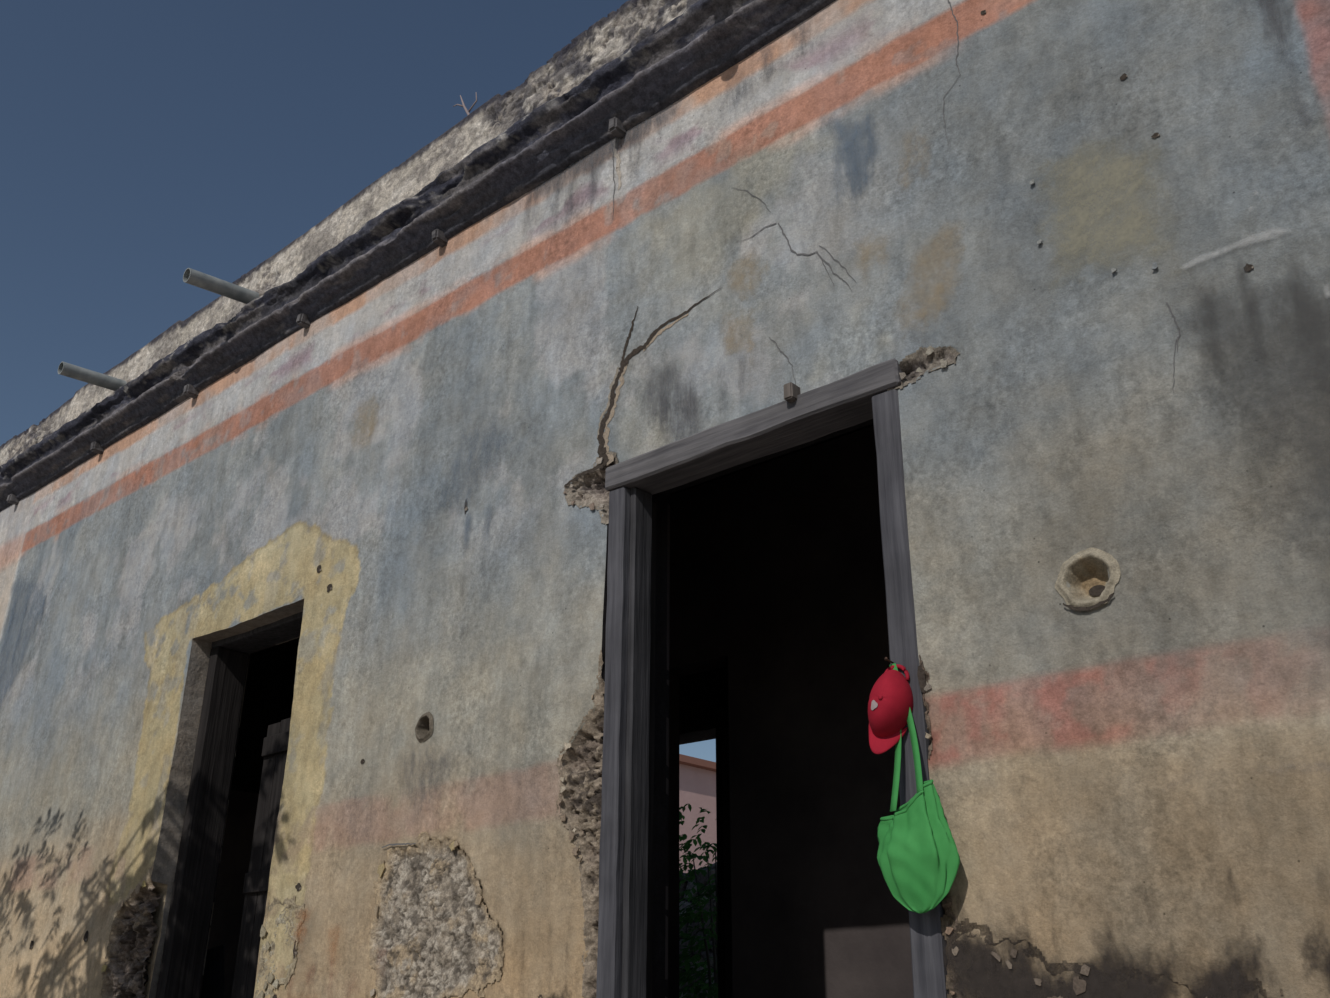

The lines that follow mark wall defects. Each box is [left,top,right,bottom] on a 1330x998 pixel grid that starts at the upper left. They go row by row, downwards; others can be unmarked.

crack [736,188,856,291]
crack [564,289,719,487]
spalling [563,451,618,524]
spalling [556,650,605,998]
spalling [368,832,504,998]
damp [943,932,1261,998]